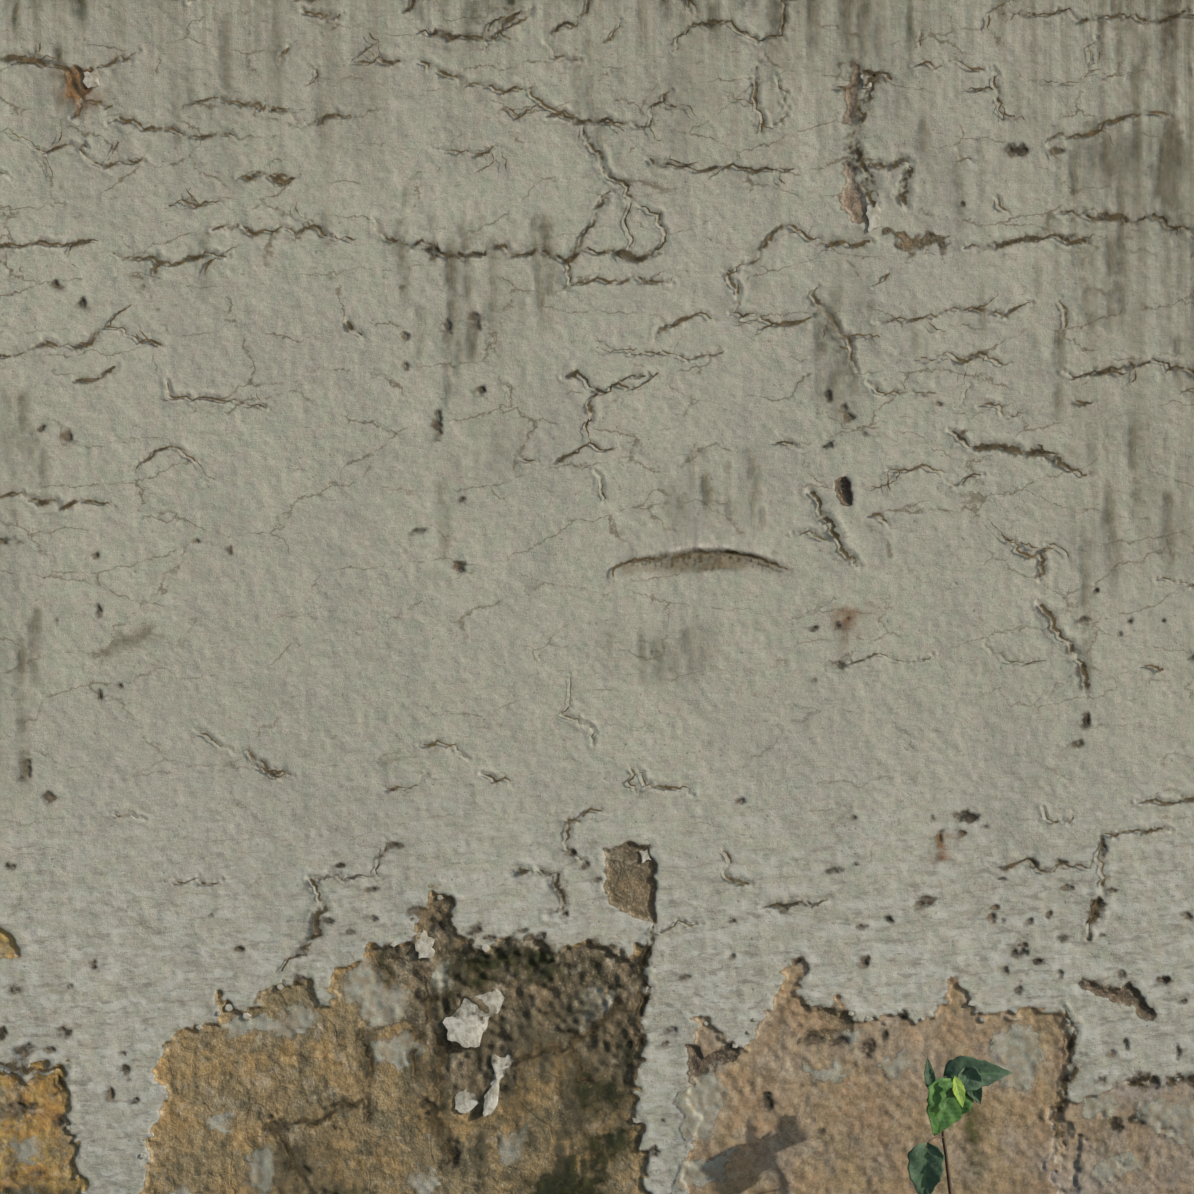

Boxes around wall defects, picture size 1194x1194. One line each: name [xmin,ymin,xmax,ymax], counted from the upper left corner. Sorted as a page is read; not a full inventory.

crack [0,0,795,284]
crack [837,69,914,208]
crack [968,210,1190,250]
crack [523,224,1087,523]
crack [991,522,1091,689]
spalling [0,927,21,959]
spalling [565,841,658,924]
spalling [1004,942,1044,974]
crack [990,797,1194,936]
peeling [0,1043,89,1194]
peeling [128,884,661,1194]
peeling [672,955,1194,1194]